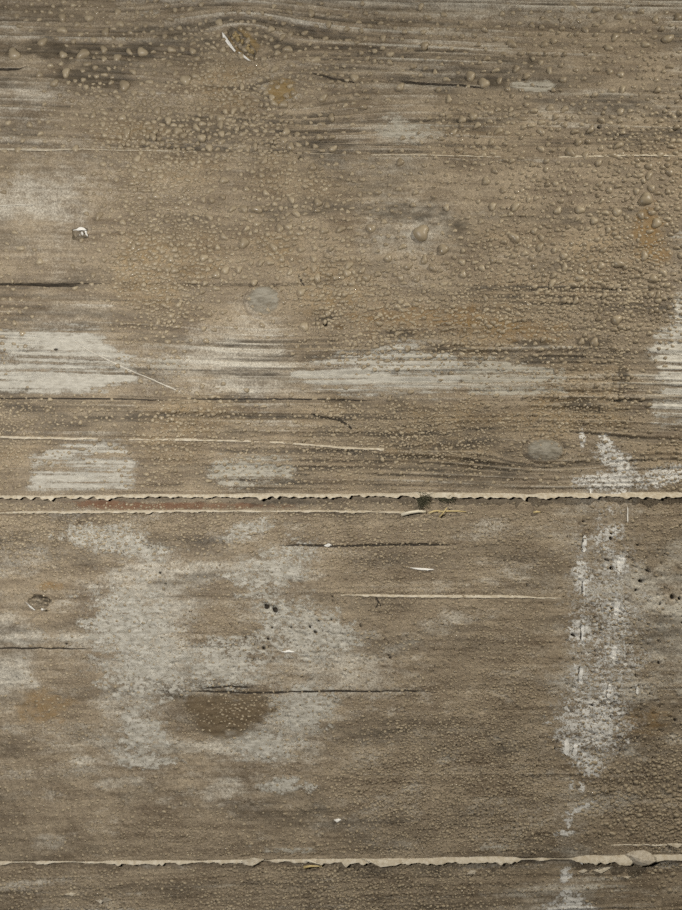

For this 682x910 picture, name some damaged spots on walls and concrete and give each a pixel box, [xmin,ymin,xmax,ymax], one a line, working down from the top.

damp [572,433,682,494]
damp [545,506,648,792]
damp [556,800,595,836]
peeling [242,857,264,866]
peeling [362,858,406,867]
spalling [578,850,657,873]
damp [542,867,601,910]